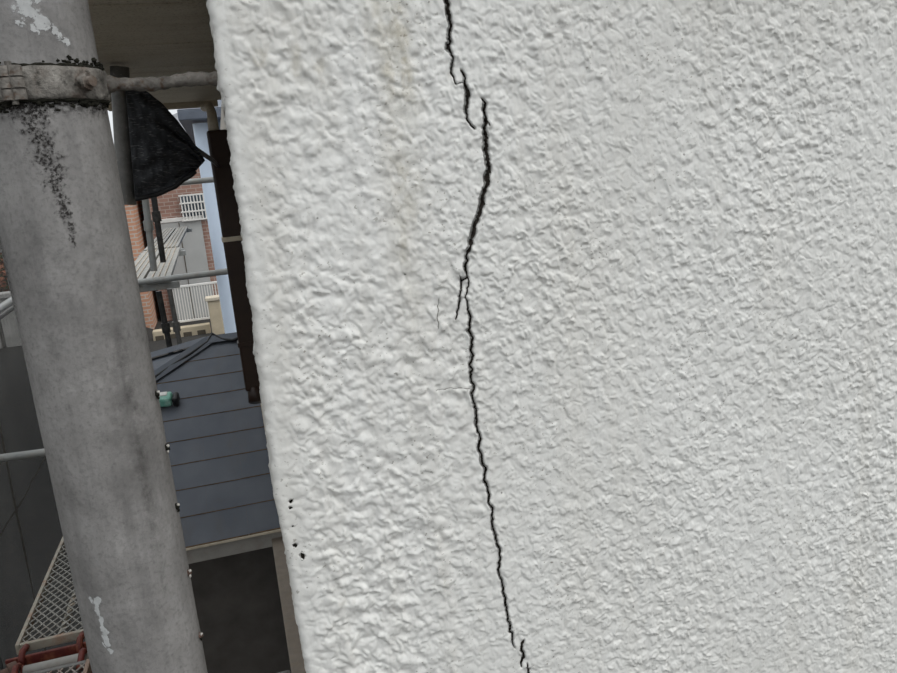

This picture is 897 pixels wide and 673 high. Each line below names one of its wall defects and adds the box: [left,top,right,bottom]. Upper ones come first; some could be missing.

peeling [11,0,70,46]
mould [1,101,107,244]
crack [436,0,529,673]
peeling [89,597,114,654]